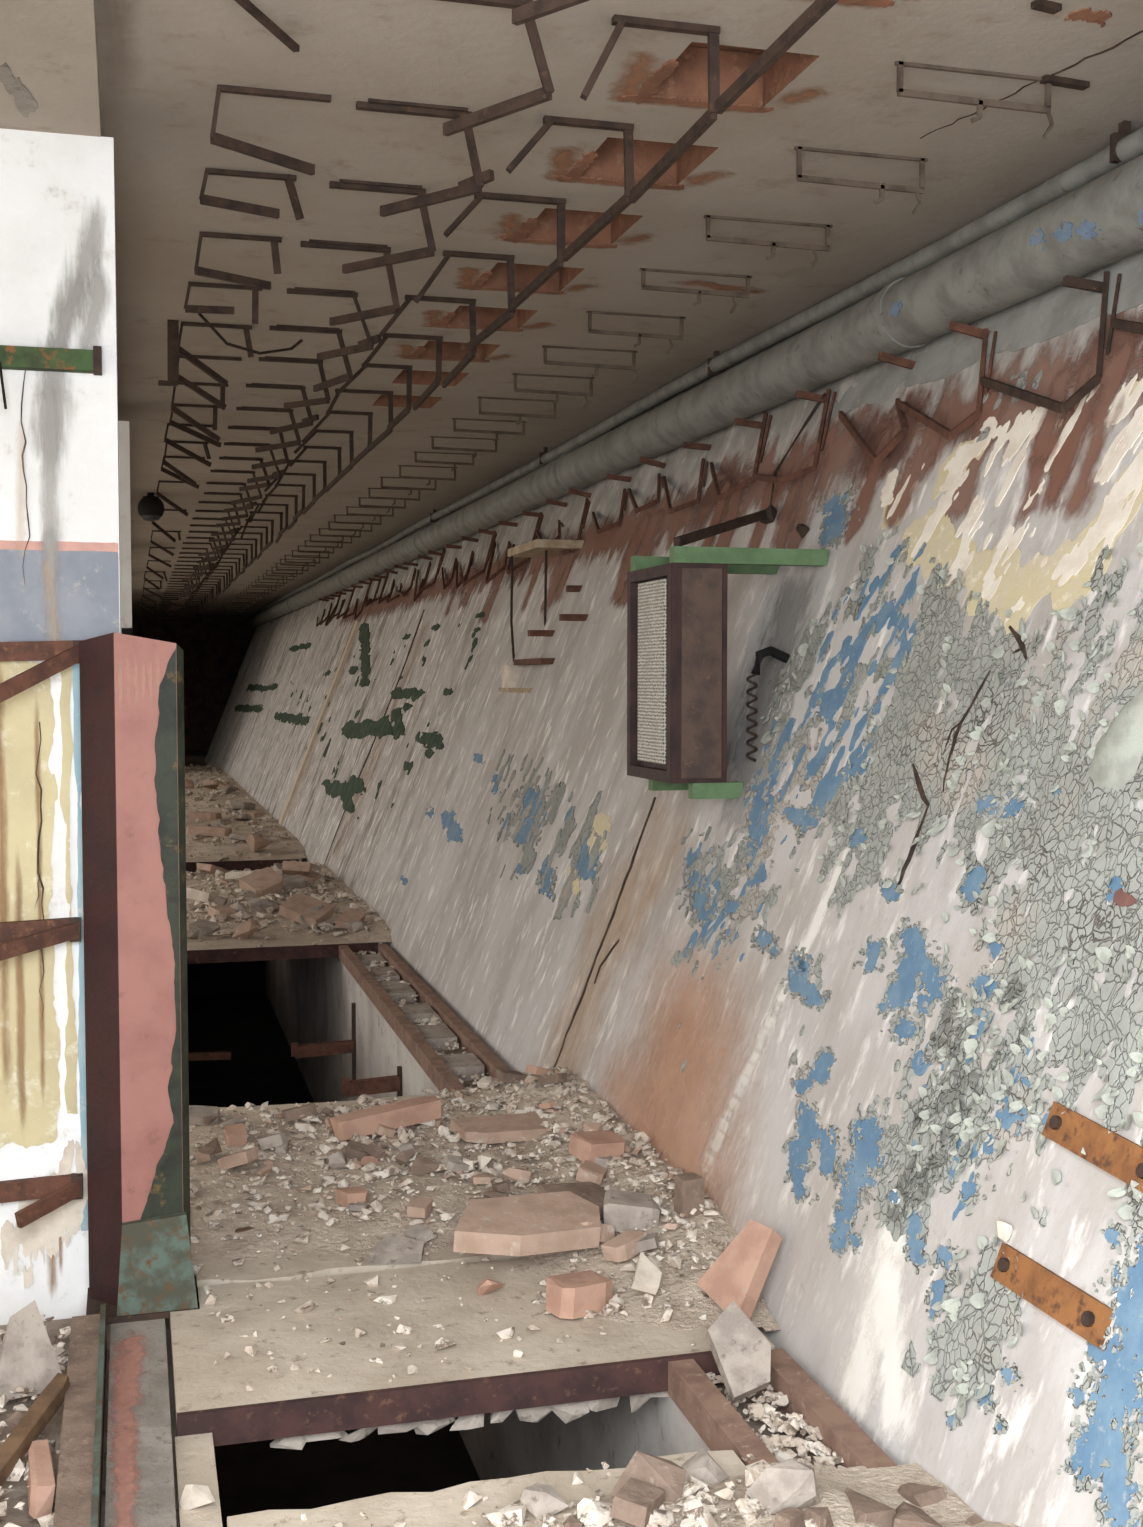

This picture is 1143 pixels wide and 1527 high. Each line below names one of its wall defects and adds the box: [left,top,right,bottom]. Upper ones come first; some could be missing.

damp [52,214,105,349]
damp [41,371,64,641]
peeling [0,540,119,642]
peeling [234,623,444,820]
peeling [458,612,485,670]
corrosion [340,311,1143,635]
peeling [0,661,88,1289]
peeling [670,370,1143,1436]
peeling [1057,1180,1143,1527]